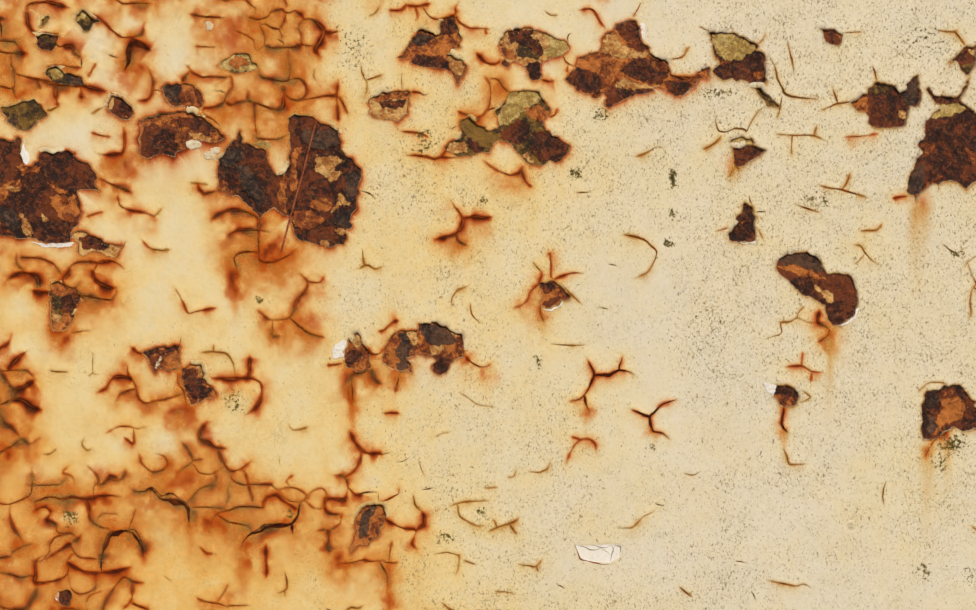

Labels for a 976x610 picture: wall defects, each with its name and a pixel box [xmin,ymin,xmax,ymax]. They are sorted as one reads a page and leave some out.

peeling [0,93,124,262]
crack [0,0,348,334]
peeling [102,81,364,253]
crack [372,2,509,162]
peeling [443,12,780,169]
peeling [846,46,976,201]
rust [48,327,76,349]
rust [164,402,198,429]
crack [0,334,474,610]
rust [224,233,299,301]
crack [179,182,405,417]
rust [346,382,358,420]